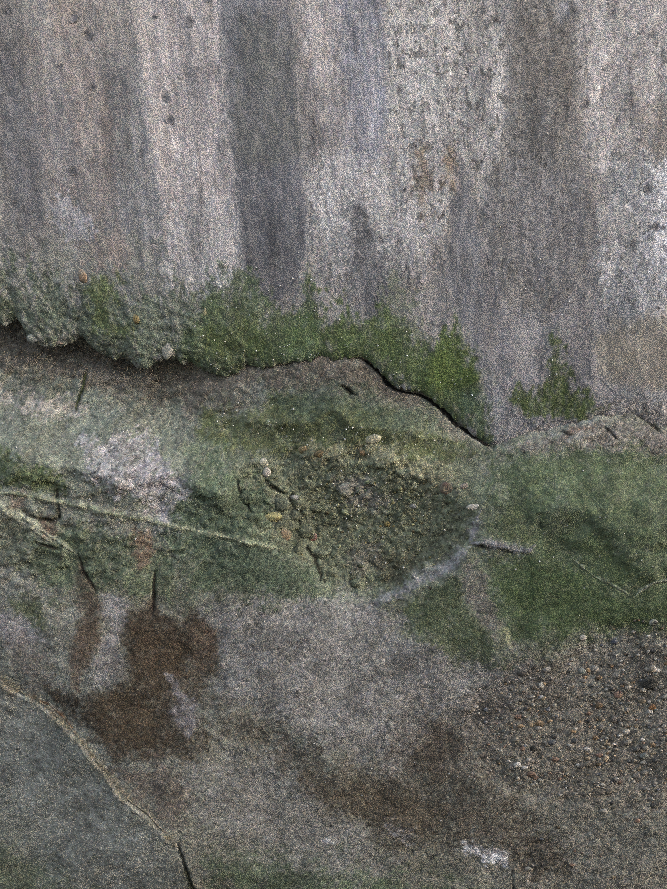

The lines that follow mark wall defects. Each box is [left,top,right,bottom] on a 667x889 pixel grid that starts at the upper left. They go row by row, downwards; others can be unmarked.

water stain [0,0,106,269]
water stain [129,0,667,437]
crack [75,372,86,412]
crack [364,360,490,446]
water stain [287,434,476,500]
water stain [86,587,133,689]
water stain [161,670,200,743]
crack [178,846,194,889]